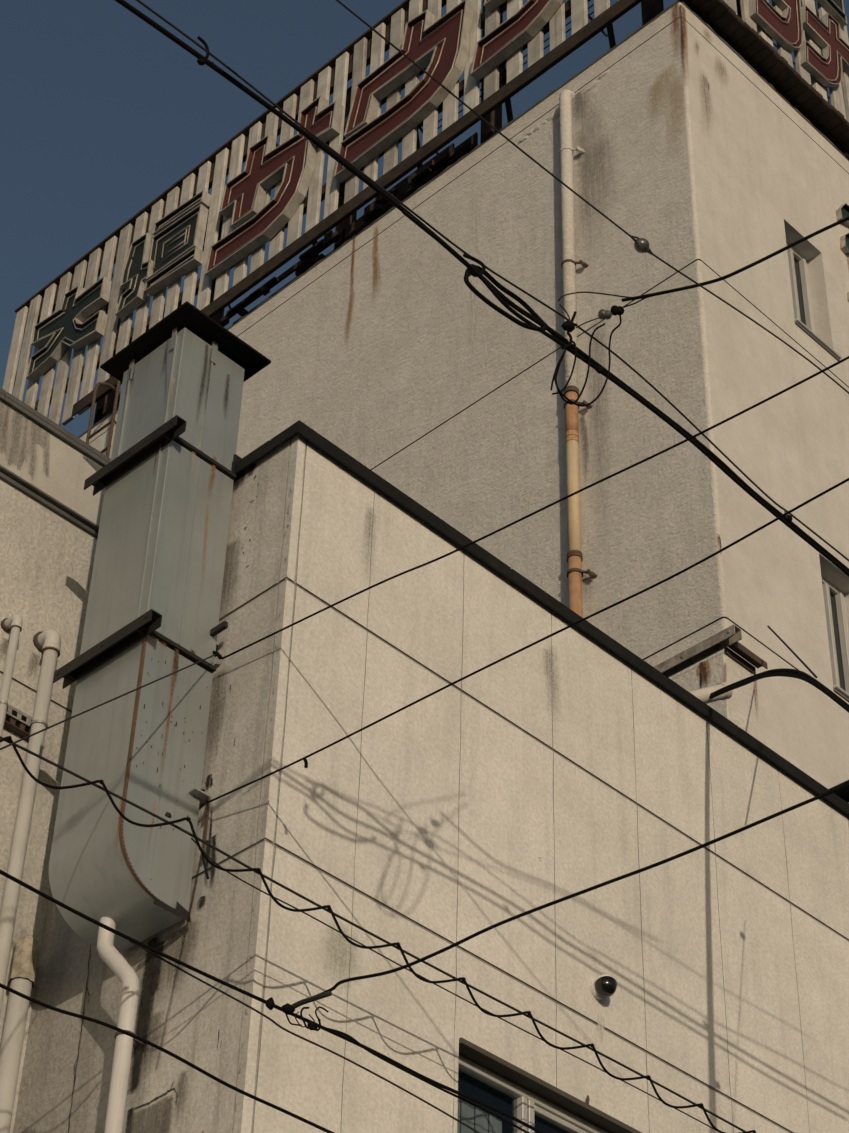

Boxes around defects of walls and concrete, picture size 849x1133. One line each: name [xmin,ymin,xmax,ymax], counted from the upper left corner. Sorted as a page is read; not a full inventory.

corrosion [673,3,686,67]
corrosion [153,638,195,741]
leakage [205,811,216,882]
leakage [131,922,196,1092]
leakage [126,1073,185,1133]